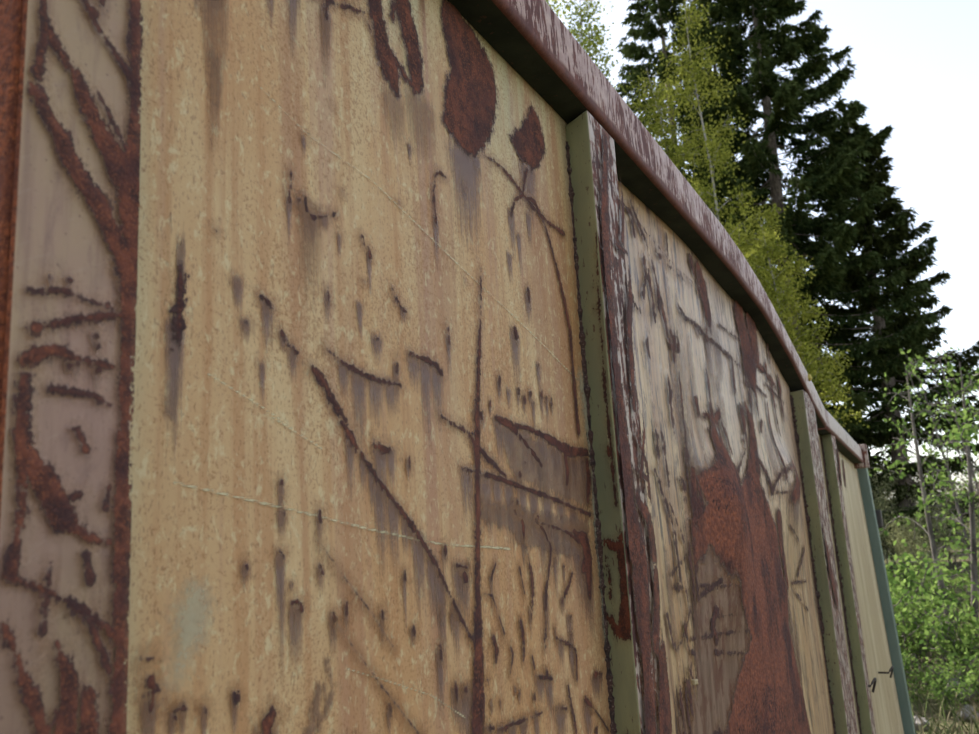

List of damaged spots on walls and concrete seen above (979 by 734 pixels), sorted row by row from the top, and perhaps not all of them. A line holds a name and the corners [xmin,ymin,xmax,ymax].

corrosion [27,0,140,295]
corrosion [368,0,424,98]
corrosion [440,0,499,230]
corrosion [506,105,545,276]
corrosion [166,260,190,400]
corrosion [2,274,125,583]
corrosion [461,363,594,618]
corrosion [614,192,811,734]
corrosion [603,531,631,642]
corrosion [0,618,100,734]
corrosion [258,706,278,734]
corrosion [484,668,553,734]